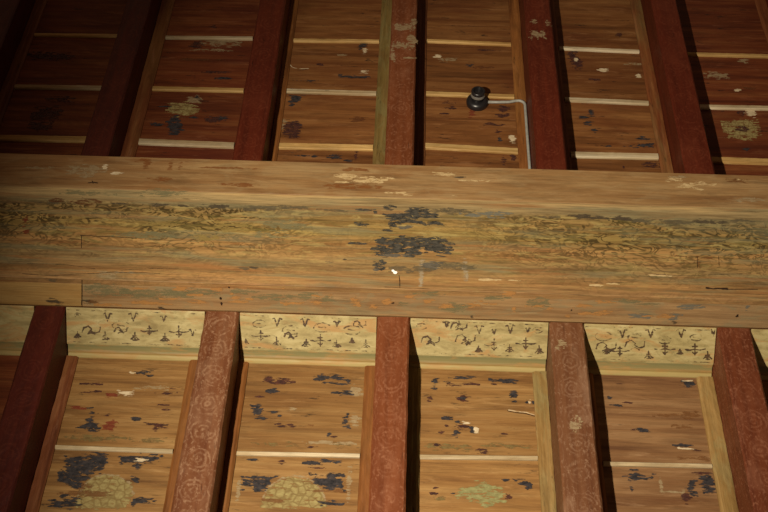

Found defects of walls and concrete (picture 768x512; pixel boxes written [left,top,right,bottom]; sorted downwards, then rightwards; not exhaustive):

peeling [150,95,228,135]
peeling [348,205,474,274]
peeling [65,406,173,443]
peeling [79,370,178,411]
peeling [250,376,297,428]
peeling [313,373,364,396]
peeling [341,413,362,429]
peeling [424,416,530,454]
peeling [427,376,534,404]
peeling [47,452,164,510]
peeling [235,459,352,510]
peeling [622,469,717,505]